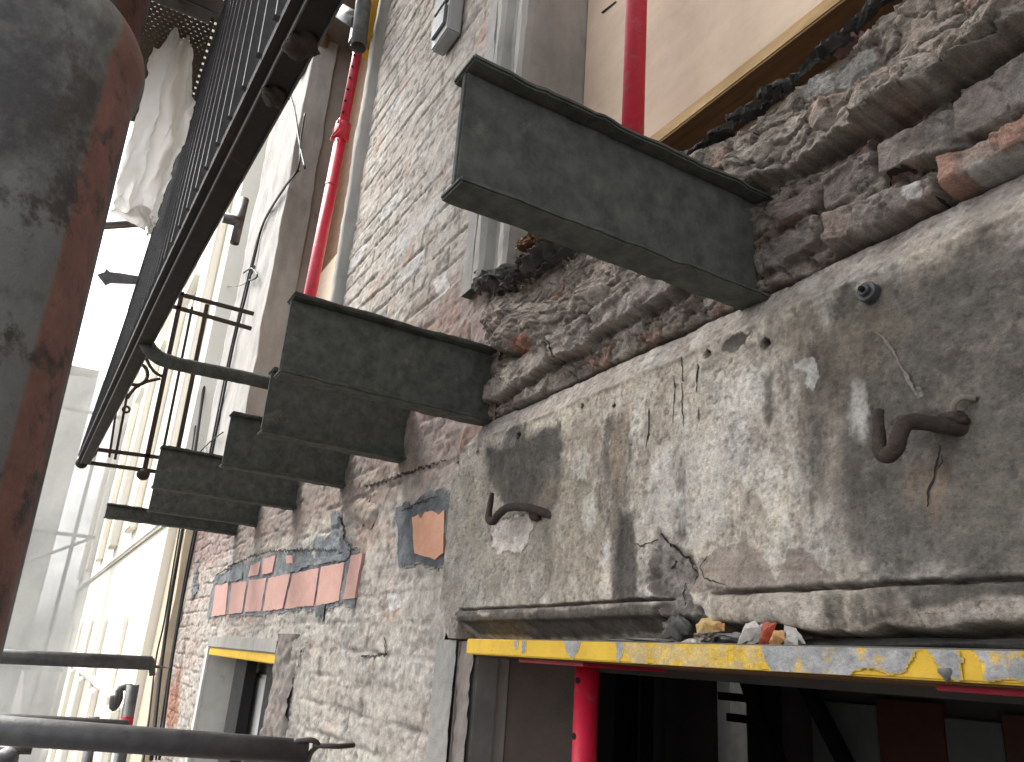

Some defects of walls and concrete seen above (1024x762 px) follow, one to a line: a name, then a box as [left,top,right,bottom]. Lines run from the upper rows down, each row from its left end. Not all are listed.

spalling [689,0,1024,294]
spalling [480,251,738,419]
crack [646,357,699,445]
peeling [792,356,821,392]
water stain [227,404,669,641]
spalling [490,513,534,555]
peeling [562,444,600,538]
crack [700,555,727,586]
peeling [617,391,838,638]
crack [926,445,943,507]